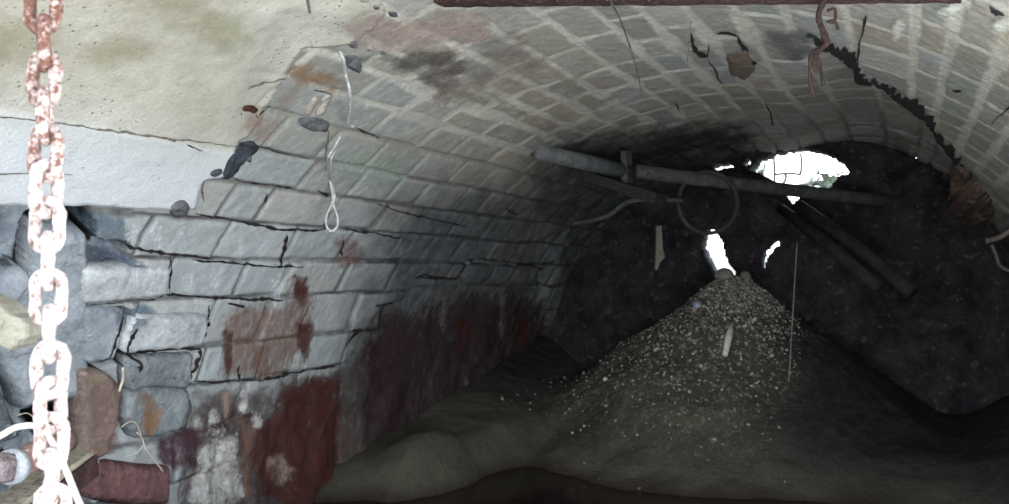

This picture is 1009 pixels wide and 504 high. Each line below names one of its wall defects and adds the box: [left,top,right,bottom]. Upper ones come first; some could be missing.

crack [990,7,1004,17]
crack [0,116,329,160]
water stain [398,52,462,83]
crack [806,15,964,168]
corrosion [223,275,313,382]
crack [85,177,544,384]
corrosion [144,404,200,469]
corrosion [241,371,341,504]